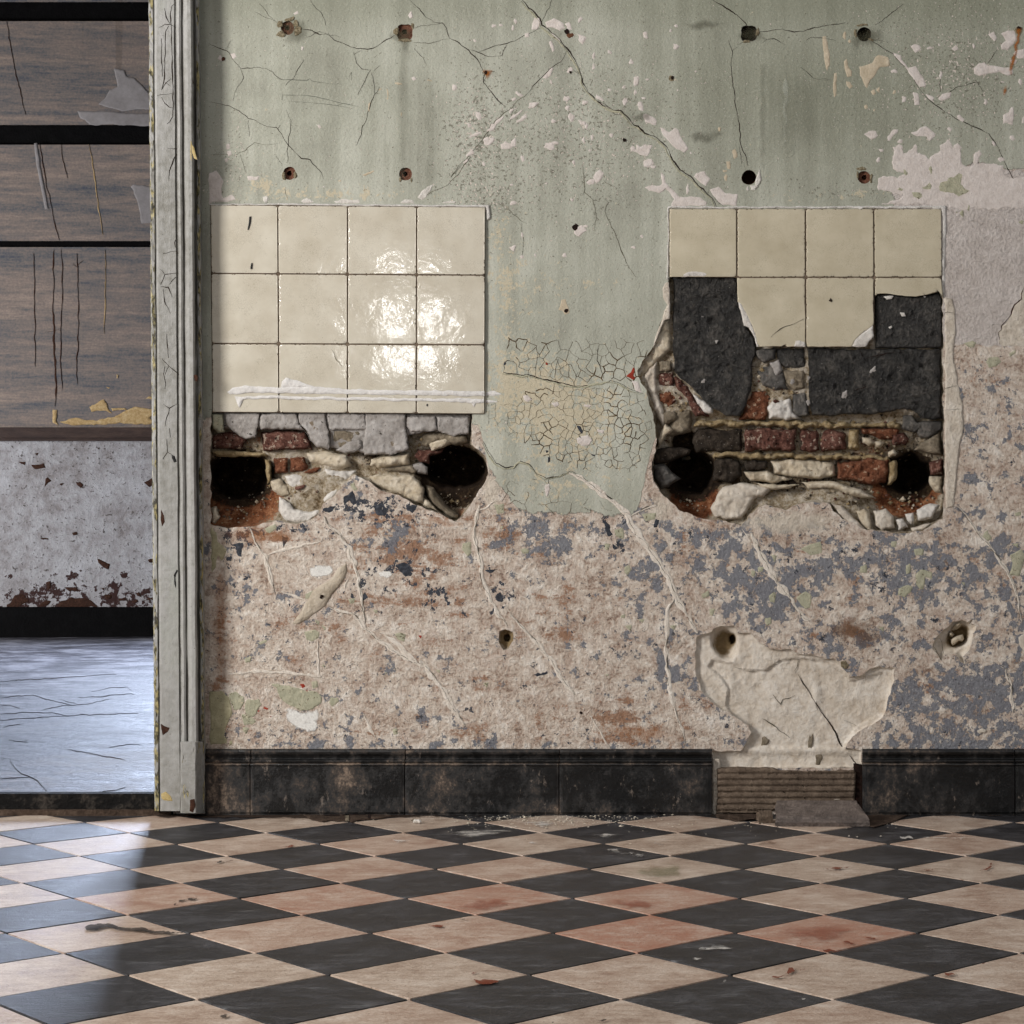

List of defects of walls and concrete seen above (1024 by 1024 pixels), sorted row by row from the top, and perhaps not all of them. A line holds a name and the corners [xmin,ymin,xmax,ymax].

crack [209,42,322,174]
crack [304,0,722,207]
crack [582,164,636,277]
peeling [630,144,762,206]
crack [713,0,843,165]
peeling [856,115,1024,224]
crack [875,4,1014,179]
flaking render [626,271,976,547]
peeling [7,581,153,607]
flaking render [210,412,488,572]
crack [473,337,698,747]
flaking render [695,590,894,815]